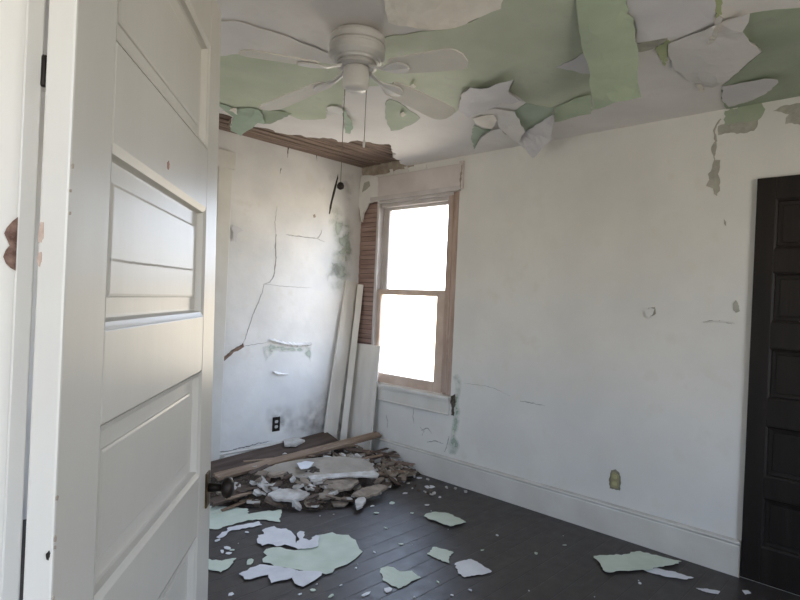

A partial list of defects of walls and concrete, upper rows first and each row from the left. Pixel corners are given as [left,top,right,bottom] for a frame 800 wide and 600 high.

peeling [219,21,353,136]
peeling [369,0,800,158]
crack [245,210,322,346]